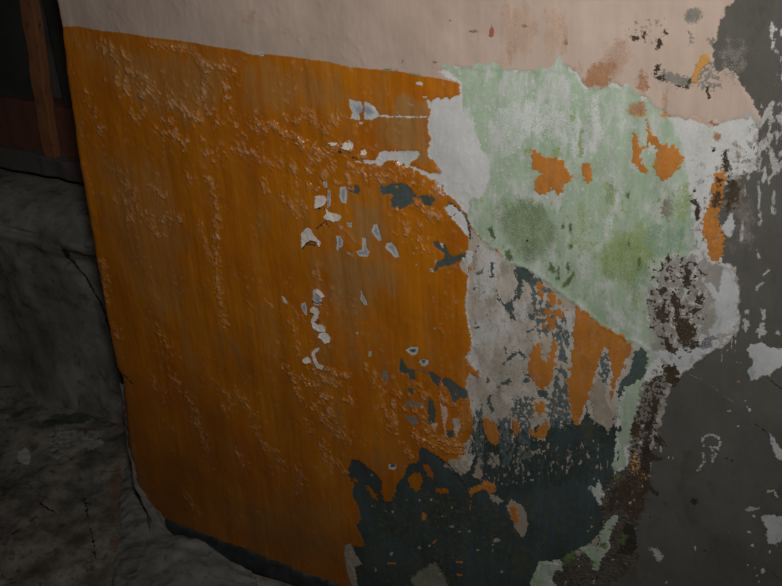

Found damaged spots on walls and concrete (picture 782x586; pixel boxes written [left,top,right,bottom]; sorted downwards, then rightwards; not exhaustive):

peeling [301,181,399,258]
leakage [488,194,574,265]
crack [61,246,110,329]
peeling [328,0,782,586]